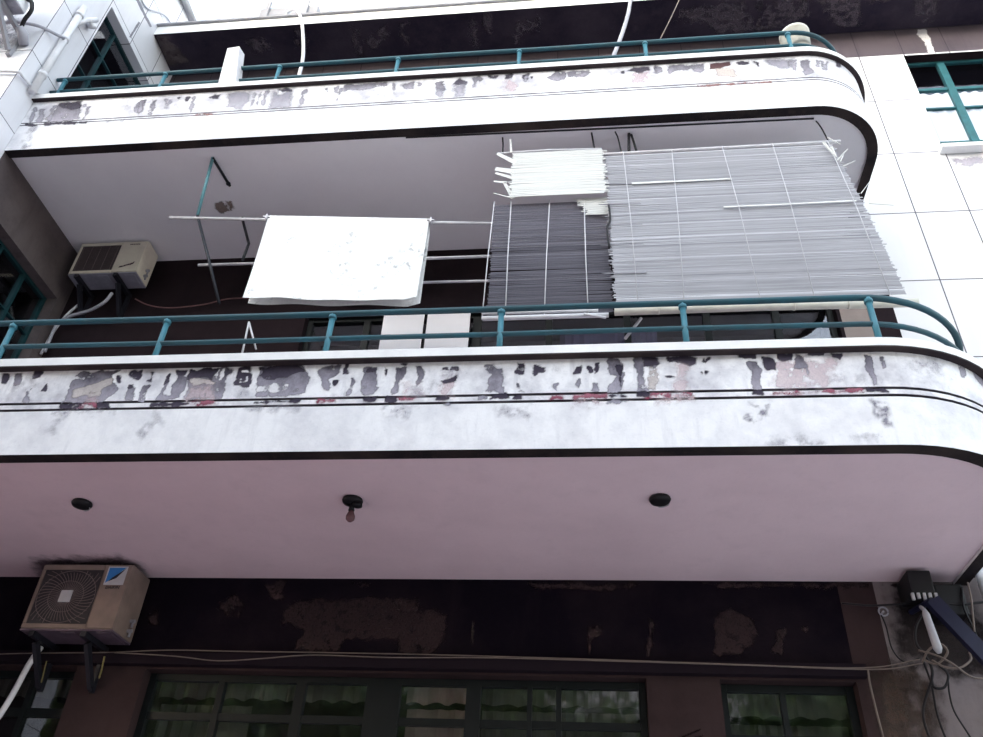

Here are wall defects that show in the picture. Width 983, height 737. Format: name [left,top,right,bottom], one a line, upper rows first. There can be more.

peeling [621,59,841,82]
peeling [25,101,91,126]
peeling [134,96,213,116]
peeling [209,88,308,109]
peeling [1,371,44,403]
peeling [59,363,425,414]
peeling [436,366,459,406]
peeling [478,363,546,400]
peeling [573,356,711,404]
peeling [737,353,843,395]
peeling [864,355,889,392]
spalling [702,581,869,589]